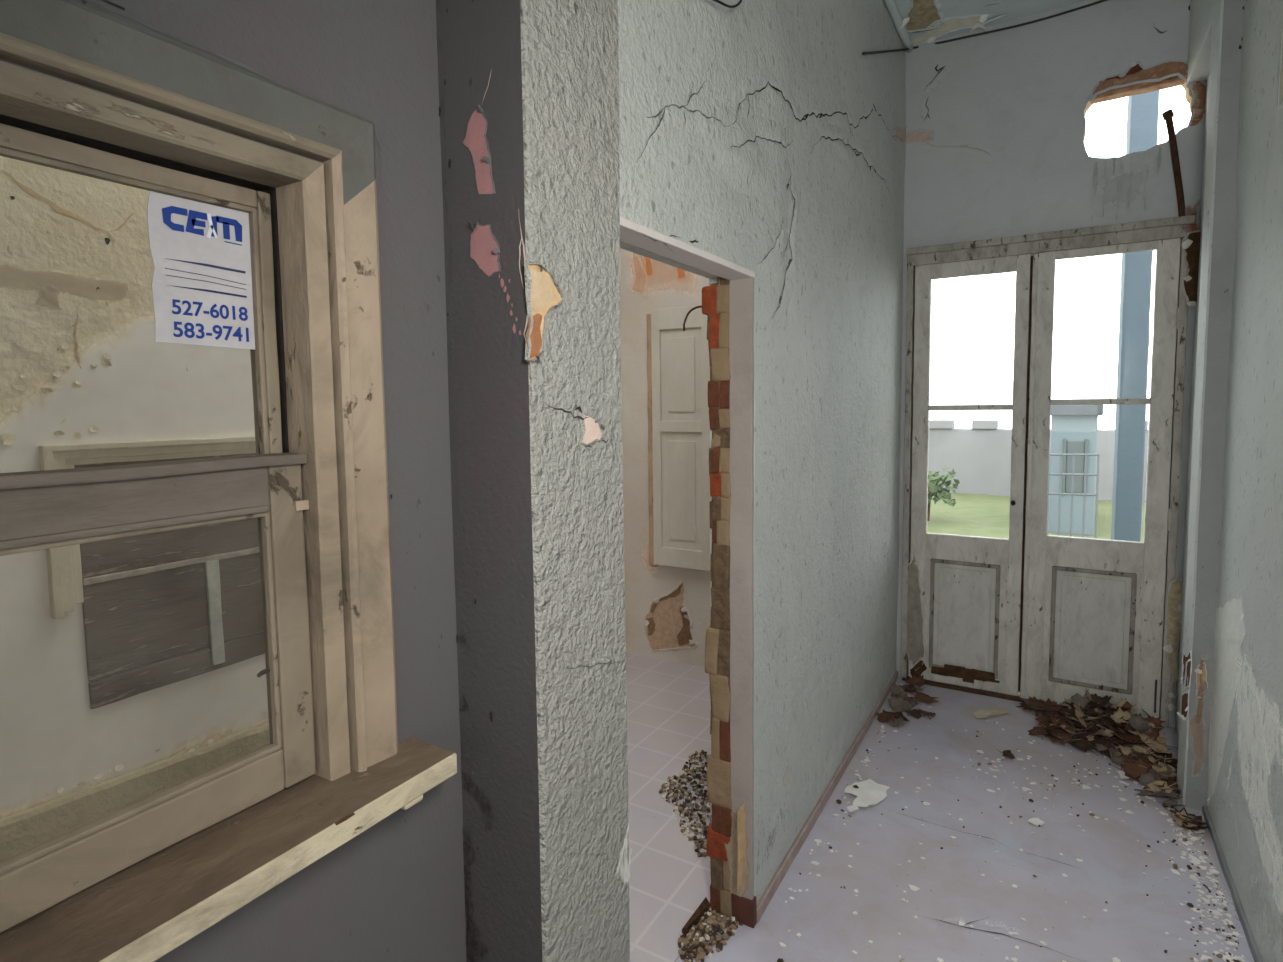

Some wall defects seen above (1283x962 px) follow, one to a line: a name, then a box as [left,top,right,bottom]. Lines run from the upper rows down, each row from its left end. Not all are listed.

spalling [899,0,991,46]
spalling [1086,59,1206,128]
peeling [463,105,496,196]
crack [636,64,950,331]
spalling [468,221,564,364]
peeling [580,414,605,448]
flaking render [643,277,732,917]